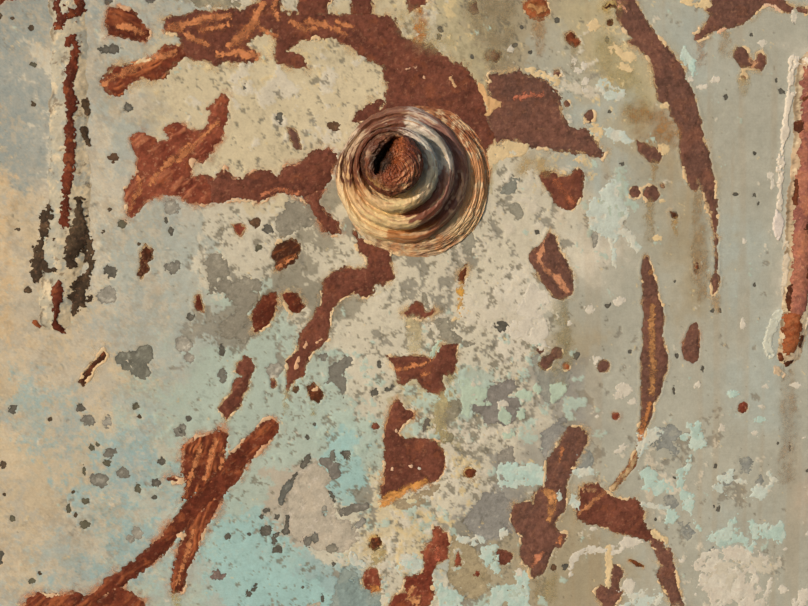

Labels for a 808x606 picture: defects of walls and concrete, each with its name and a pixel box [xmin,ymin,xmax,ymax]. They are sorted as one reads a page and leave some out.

rust [24,0,96,334]
rust [99,0,609,211]
rust [602,0,720,309]
peeling [767,54,808,297]
peeling [115,344,154,380]
rust [20,355,279,606]
peeling [247,448,382,606]
peeling [317,353,353,399]
rust [371,301,459,507]
rust [496,255,684,606]
peeling [550,536,663,606]
peeling [614,420,808,606]